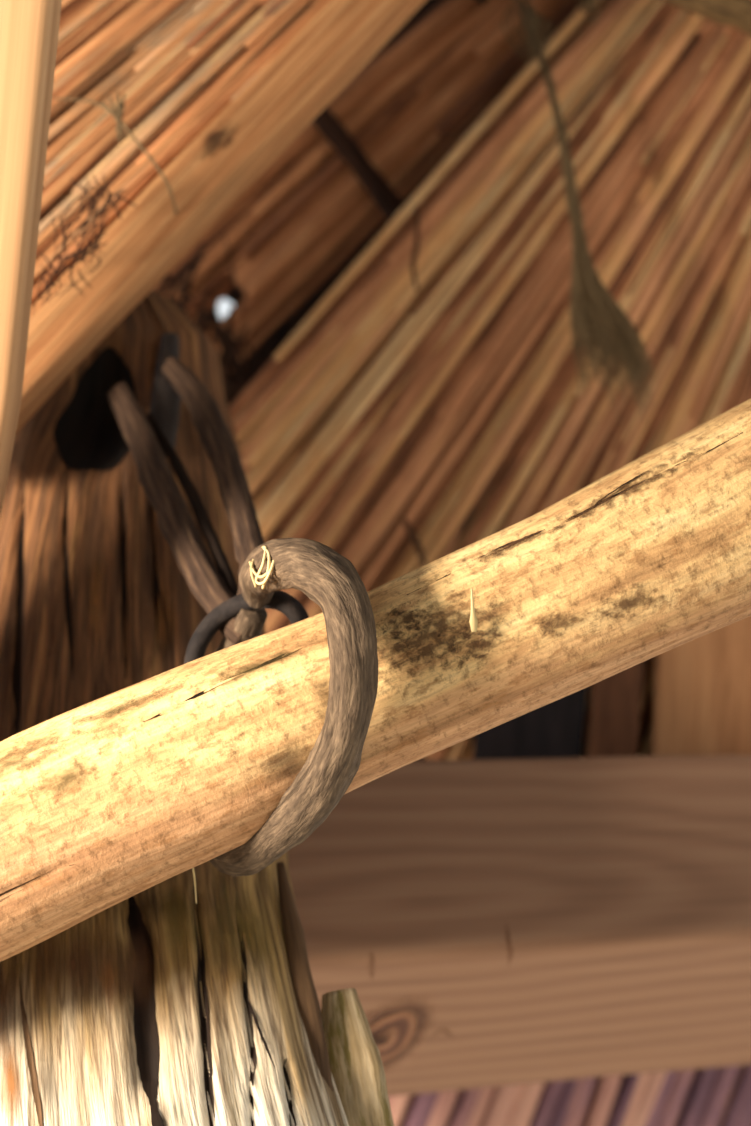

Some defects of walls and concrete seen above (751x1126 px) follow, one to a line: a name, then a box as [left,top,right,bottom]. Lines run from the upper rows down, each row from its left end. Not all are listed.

crack [483,469,650,558]
mould [377,593,500,682]
crack [0,877,38,902]
crack [127,896,164,1126]
crack [193,882,215,1126]
crack [236,896,296,1126]